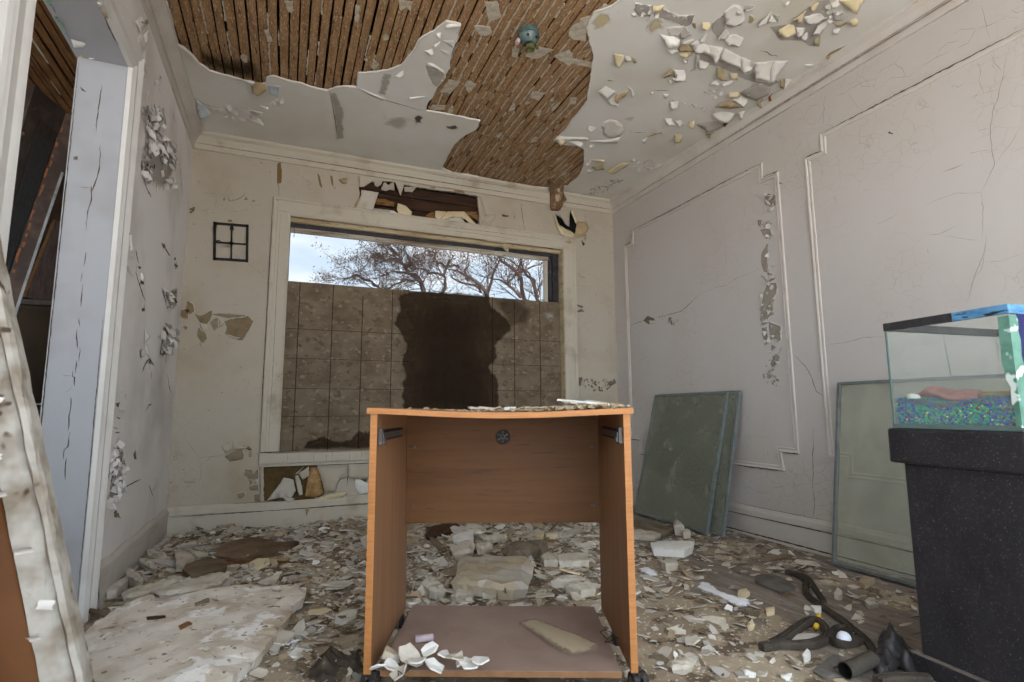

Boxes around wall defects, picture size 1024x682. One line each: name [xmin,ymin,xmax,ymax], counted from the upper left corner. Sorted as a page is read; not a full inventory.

peeling [136,16,178,196]
crack [201,143,545,240]
spalling [382,182,477,199]
flaking render [166,0,864,195]
hole [556,213,577,234]
crack [567,0,1024,301]
crack [41,65,103,602]
peeling [141,286,254,372]
leakage [395,292,510,410]
peeling [757,192,782,387]
peeling [106,390,138,518]
flaking render [184,441,369,516]